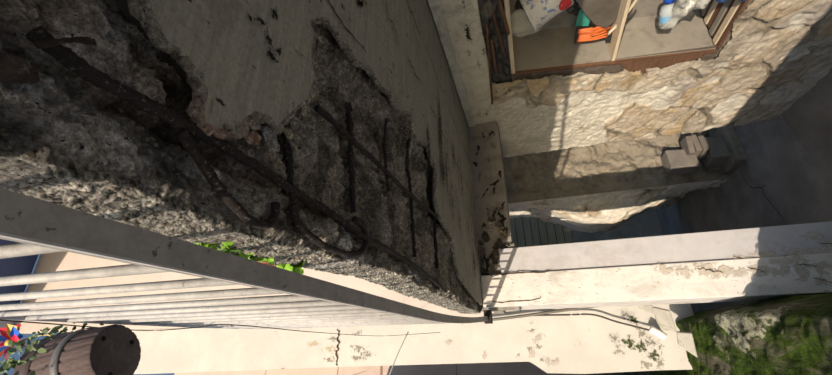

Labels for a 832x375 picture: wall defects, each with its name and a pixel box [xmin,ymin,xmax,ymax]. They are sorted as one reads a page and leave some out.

spalling [0,0,484,314]
spalling [478,211,515,276]
peeling [656,231,832,285]
crack [335,329,365,375]
leakage [610,312,664,369]